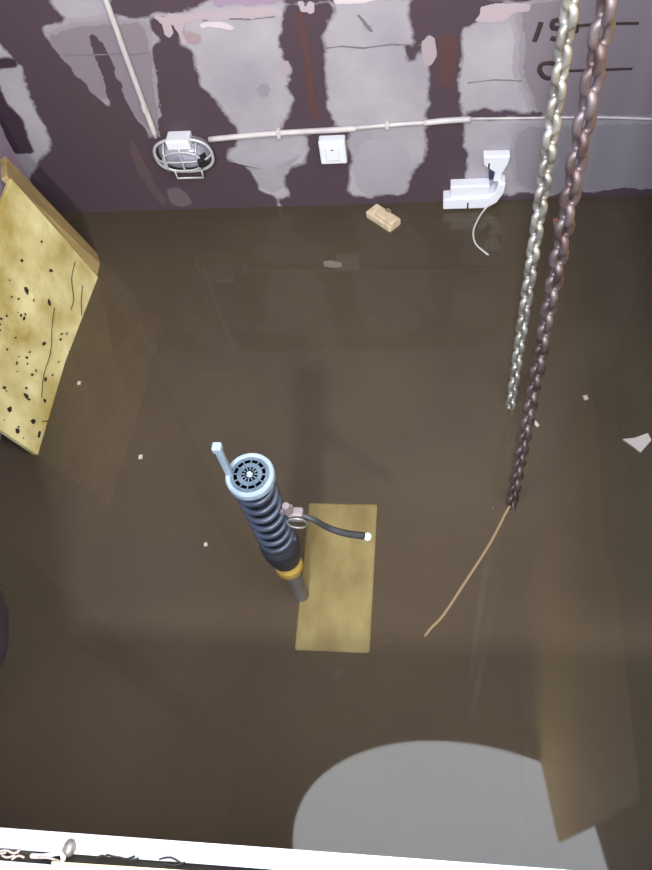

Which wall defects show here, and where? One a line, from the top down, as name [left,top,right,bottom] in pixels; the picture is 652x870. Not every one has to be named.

flaking render [154,0,283,45]
flaking render [298,1,314,14]
flaking render [475,3,530,23]
flaking render [422,35,437,66]
spalling [279,61,291,74]
spalling [167,187,192,207]